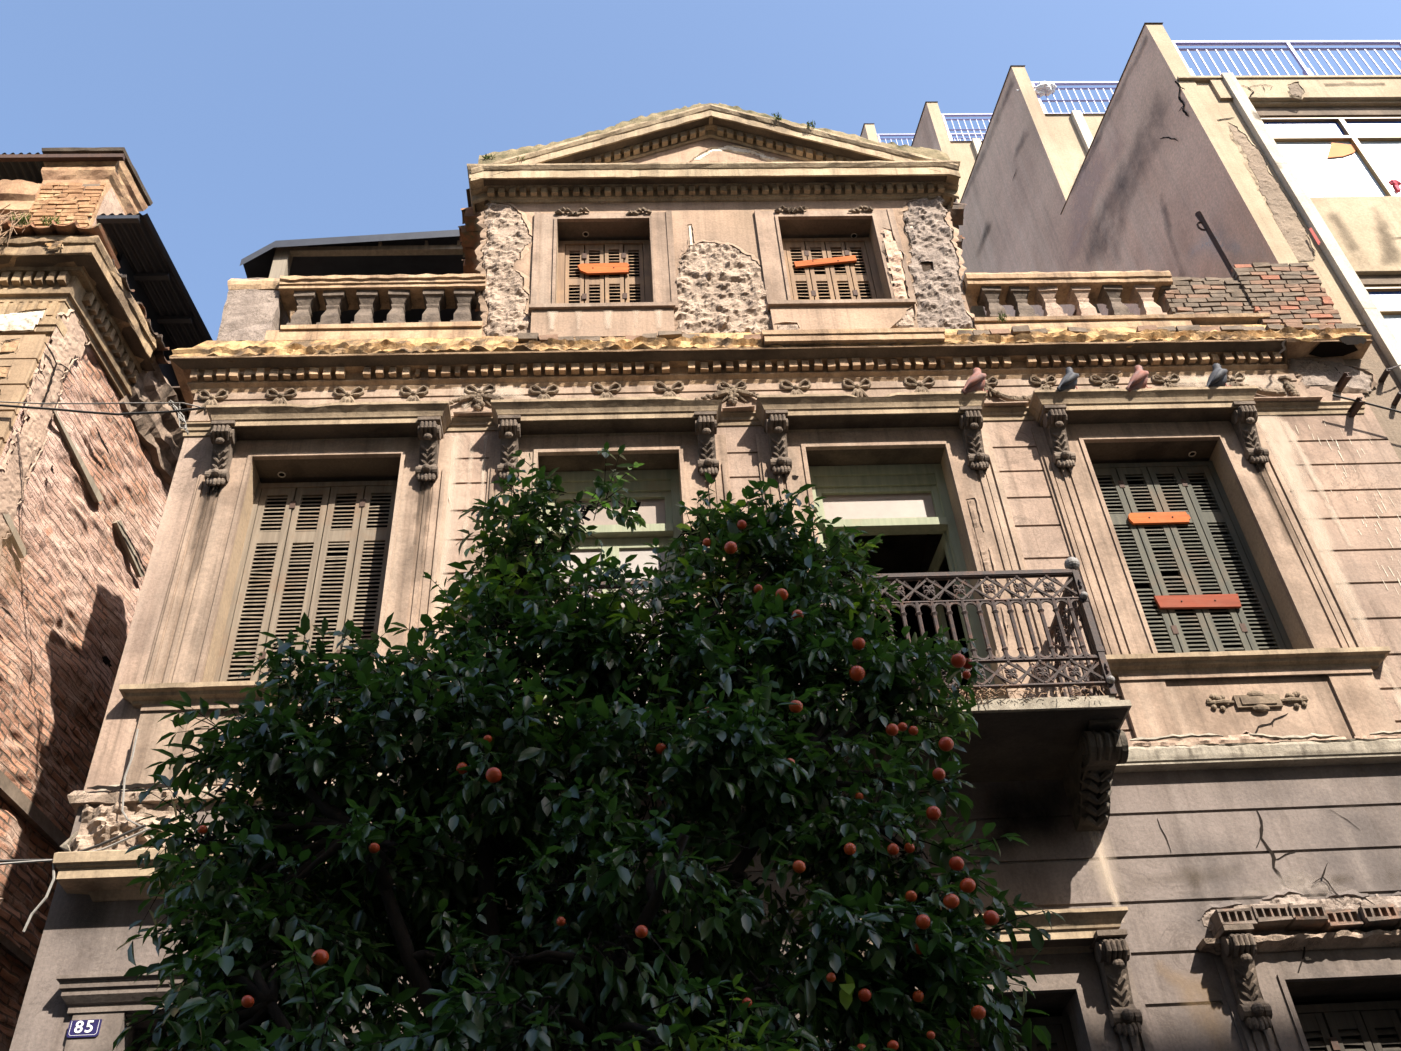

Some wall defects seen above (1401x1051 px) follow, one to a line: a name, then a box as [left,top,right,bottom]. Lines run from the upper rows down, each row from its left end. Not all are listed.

crack [1160,81,1272,141]
spalling [475,202,534,337]
spalling [674,224,800,334]
spalling [881,196,975,329]
spalling [0,308,91,559]
spalling [60,784,194,852]
crack [1256,810,1375,905]